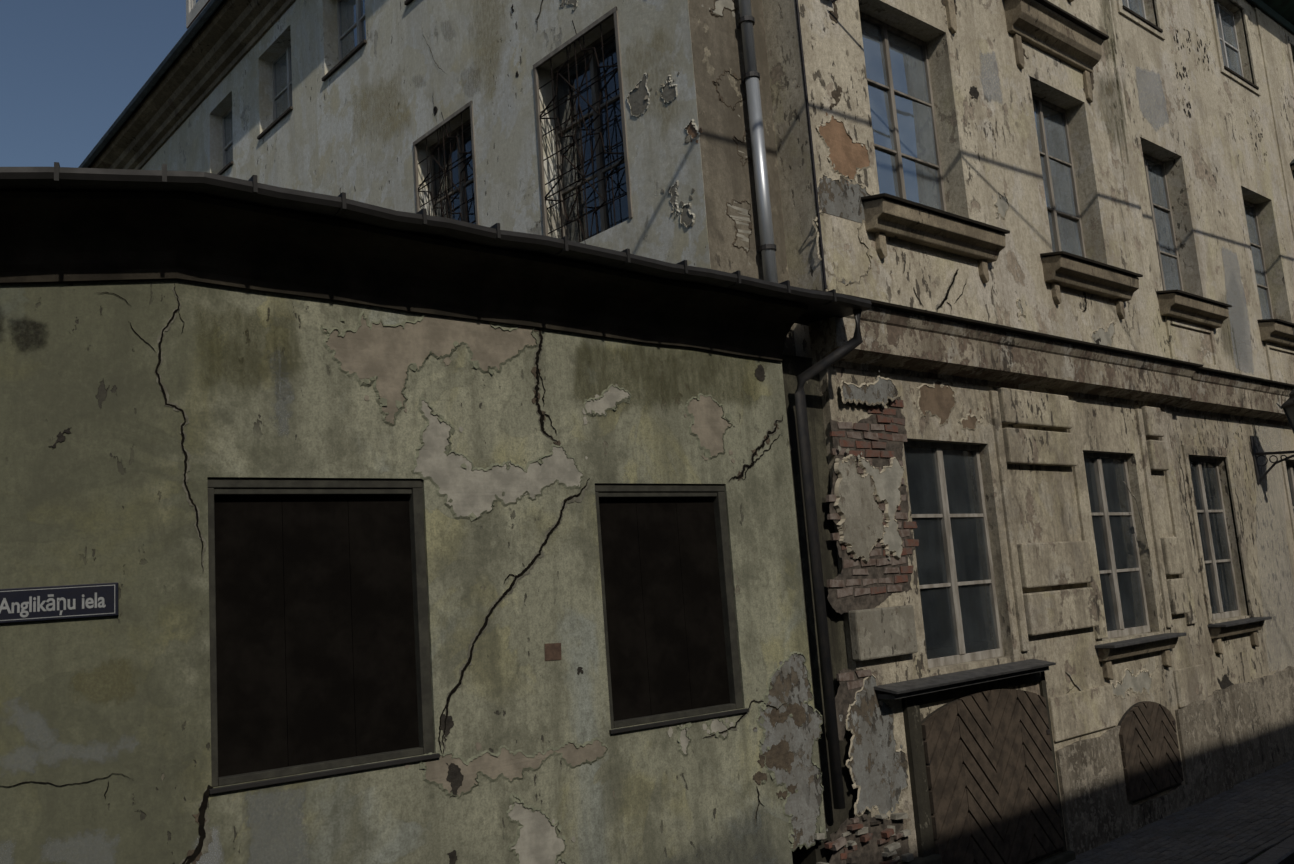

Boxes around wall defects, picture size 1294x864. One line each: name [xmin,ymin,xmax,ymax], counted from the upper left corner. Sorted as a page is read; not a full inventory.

peeling [812,85,874,286]
crack [102,283,207,571]
peeling [320,311,588,521]
crack [531,328,561,446]
crack [729,416,783,482]
flaking render [826,371,986,614]
crack [438,478,590,757]
crack [179,785,213,864]
peeling [667,717,734,756]
peeling [753,651,914,864]